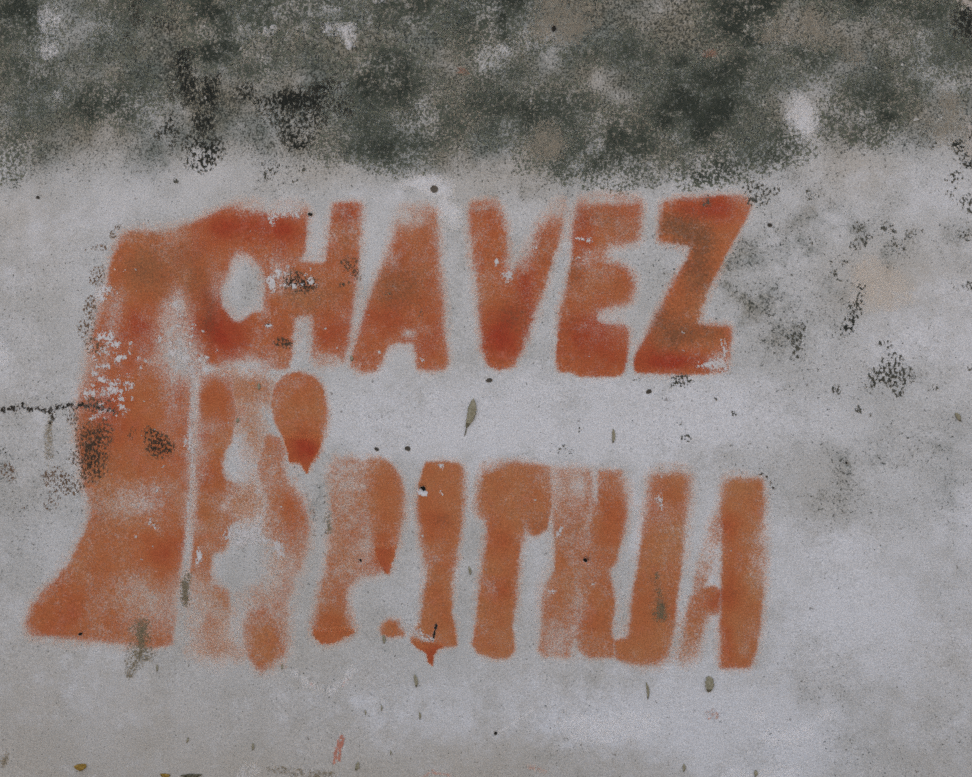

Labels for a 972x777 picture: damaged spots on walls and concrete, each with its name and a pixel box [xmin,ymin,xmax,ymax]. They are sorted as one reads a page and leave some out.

damp [0,0,972,214]